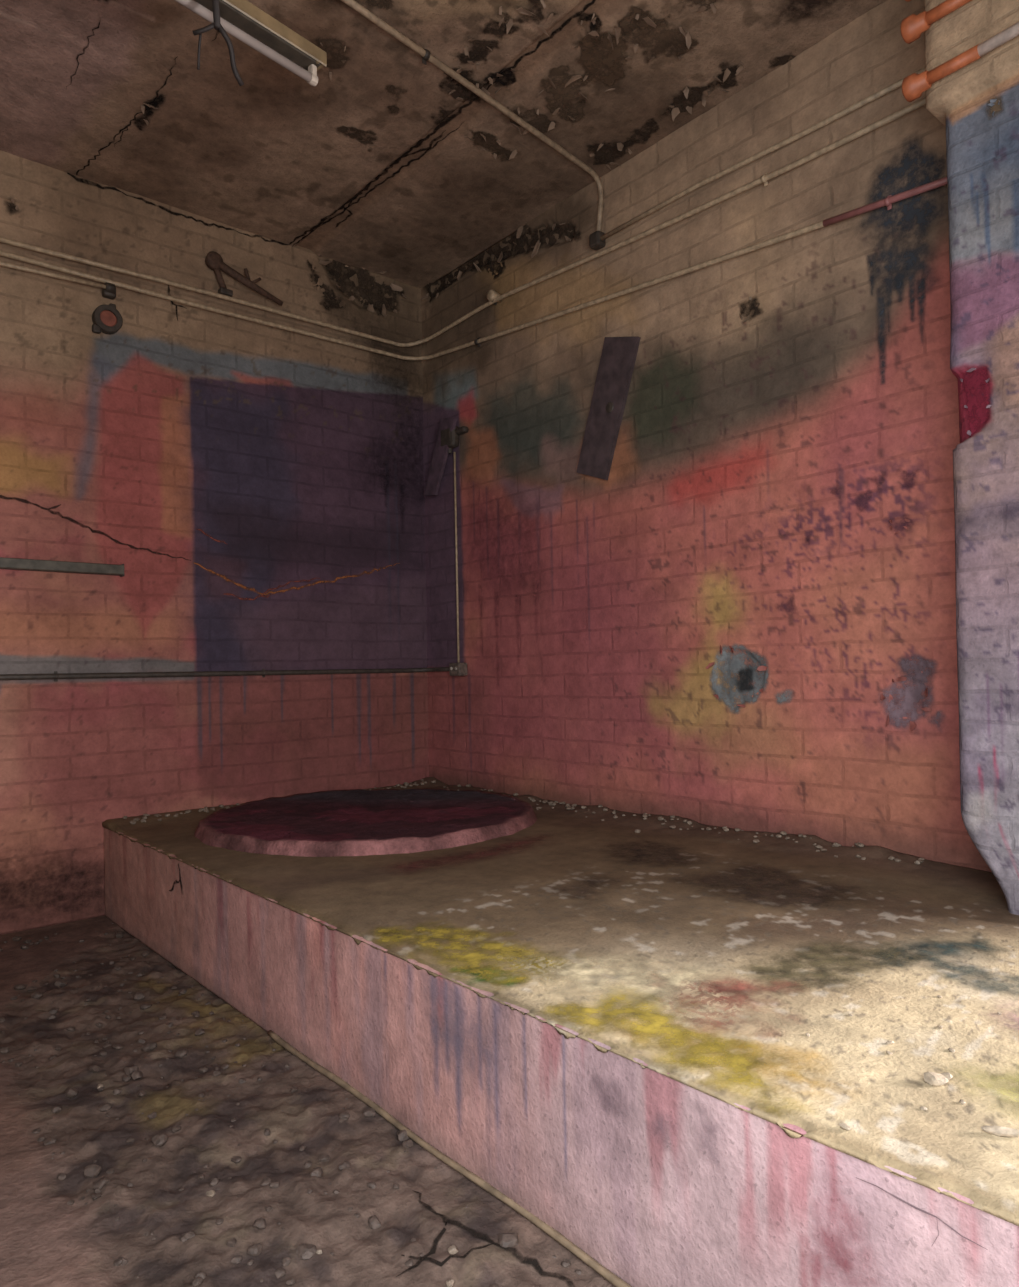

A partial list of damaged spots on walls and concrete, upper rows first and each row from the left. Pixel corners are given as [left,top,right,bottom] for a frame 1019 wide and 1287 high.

crack [66,0,596,247]
leakage [868,139,945,383]
spalling [706,645,791,713]
crack [396,1190,573,1286]